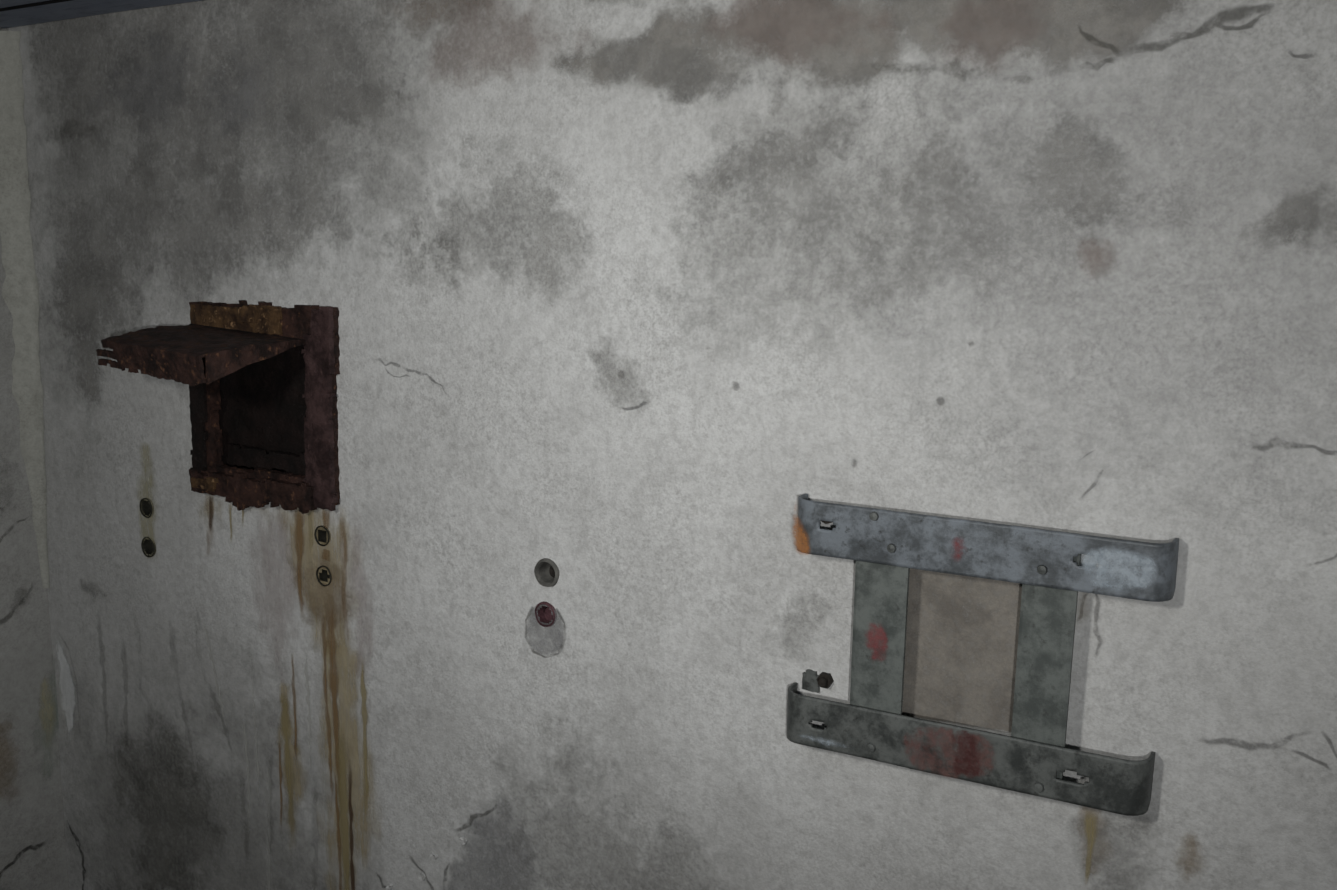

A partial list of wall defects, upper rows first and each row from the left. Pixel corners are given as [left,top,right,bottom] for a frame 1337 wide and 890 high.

corrosion [279,687,301,819]
corrosion [284,510,369,890]